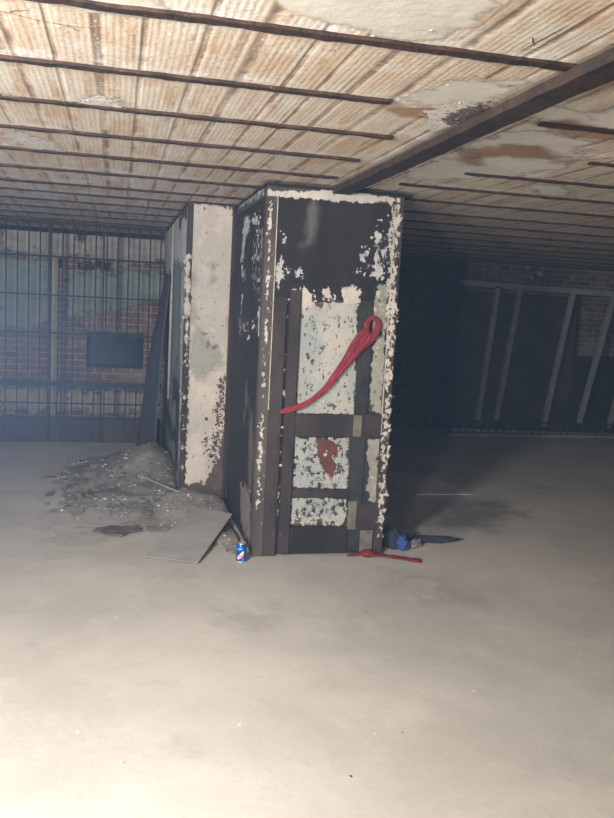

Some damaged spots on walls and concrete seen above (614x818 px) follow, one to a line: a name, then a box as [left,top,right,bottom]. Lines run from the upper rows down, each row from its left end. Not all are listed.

leakage [166,372,179,471]
peeling [0,189,405,548]